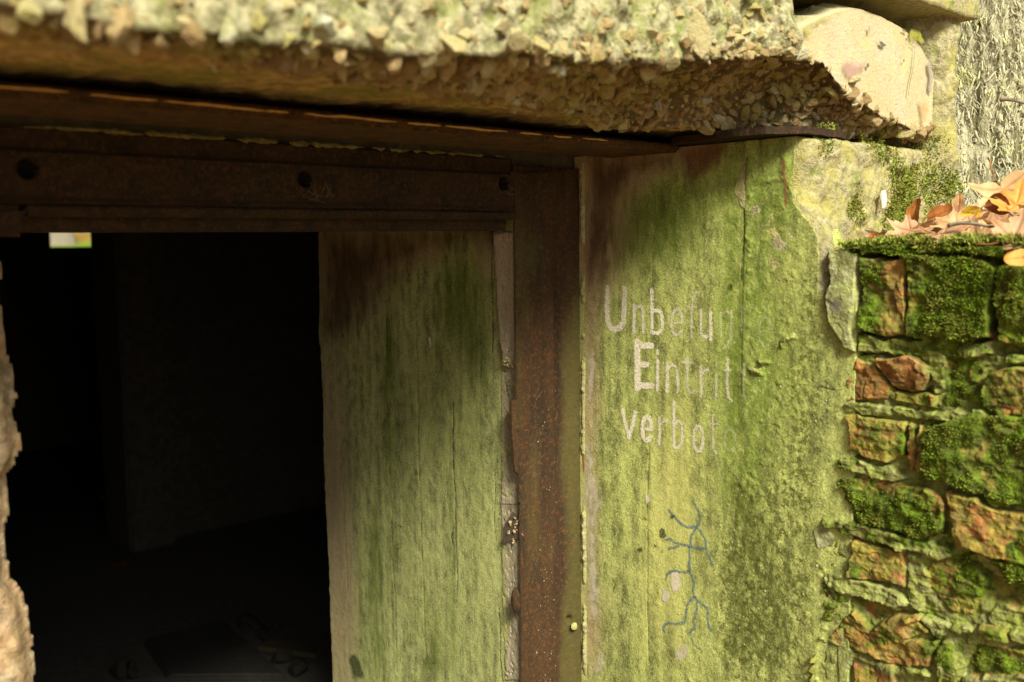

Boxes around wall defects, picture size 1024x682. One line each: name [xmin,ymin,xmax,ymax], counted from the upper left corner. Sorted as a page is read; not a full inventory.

spalling [0,0,937,144]
rust [511,587,522,613]
efflorescence [586,446,601,618]
leakage [727,479,784,666]